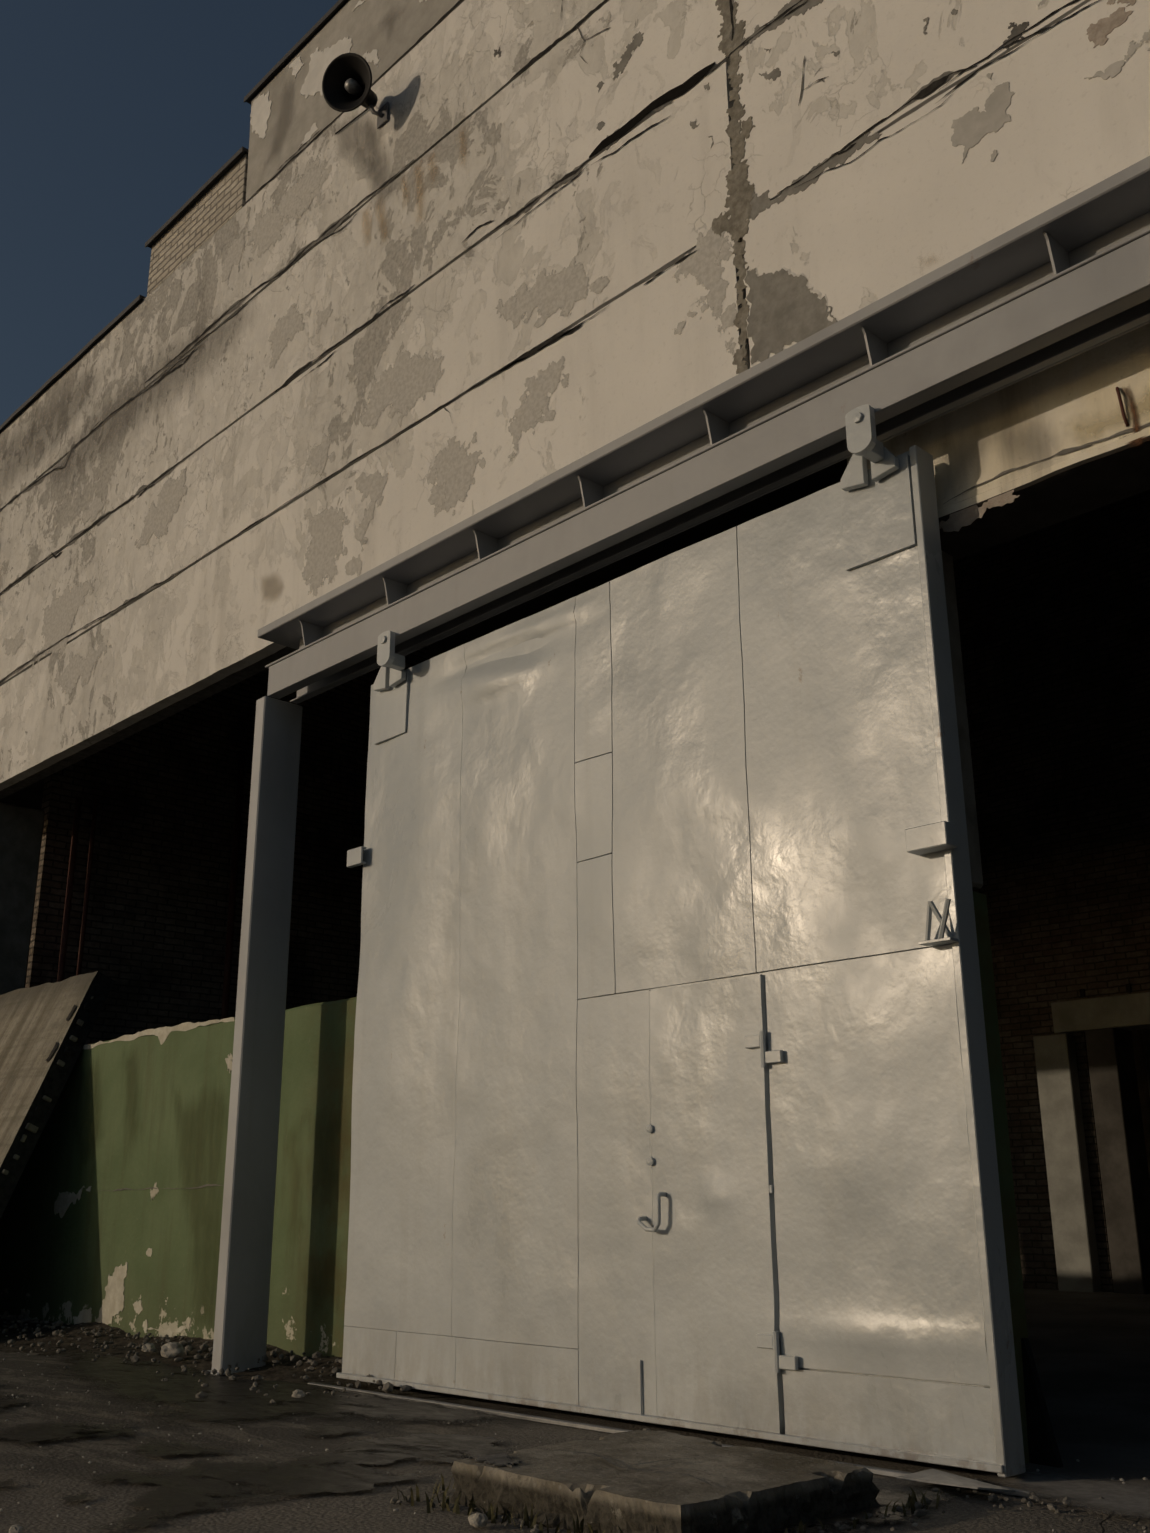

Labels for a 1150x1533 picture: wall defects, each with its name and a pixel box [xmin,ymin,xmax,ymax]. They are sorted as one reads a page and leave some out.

spalling [1086,0,1136,48]
crack [251,120,336,197]
crack [463,0,808,242]
peeling [673,0,882,374]
crack [777,0,1100,194]
peeling [951,73,1015,163]
crack [0,159,415,512]
peeling [508,356,569,461]
rust [1124,388,1145,445]
crack [0,305,609,684]
spalling [939,490,1020,532]
peeling [73,1262,191,1337]